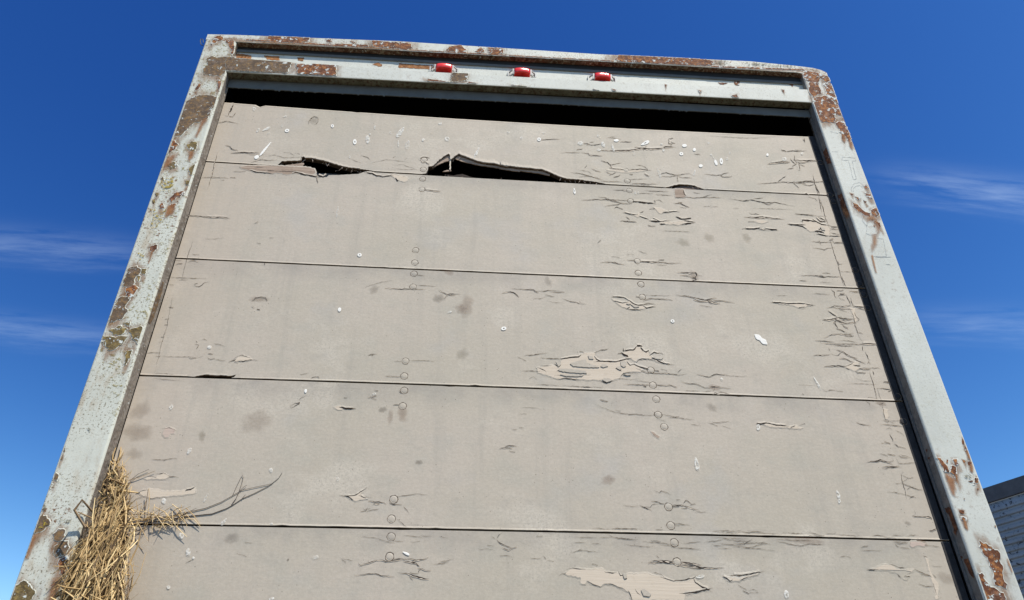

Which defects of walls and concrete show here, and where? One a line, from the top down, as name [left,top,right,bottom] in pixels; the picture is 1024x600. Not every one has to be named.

corrosion [152,35,852,216]
crack [354,155,440,192]
peeling [625,188,693,226]
peeling [789,213,831,237]
corrosion [101,244,164,367]
peeling [520,344,672,383]
crack [479,136,943,599]
peeling [134,472,197,501]
corrosion [926,439,979,535]
corrosion [10,513,71,600]
peeling [560,564,709,600]
corrosion [960,540,1012,600]